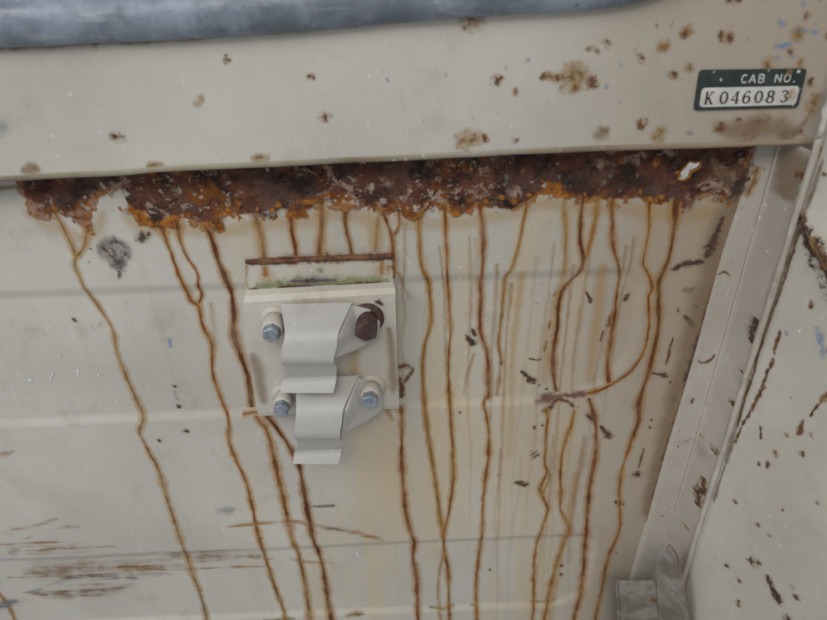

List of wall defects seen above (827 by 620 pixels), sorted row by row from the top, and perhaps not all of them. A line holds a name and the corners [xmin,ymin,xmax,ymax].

rust [539,65,598,92]
rust [715,93,819,139]
rust [693,148,827,508]
rust [0,128,765,620]
rust [765,575,782,606]